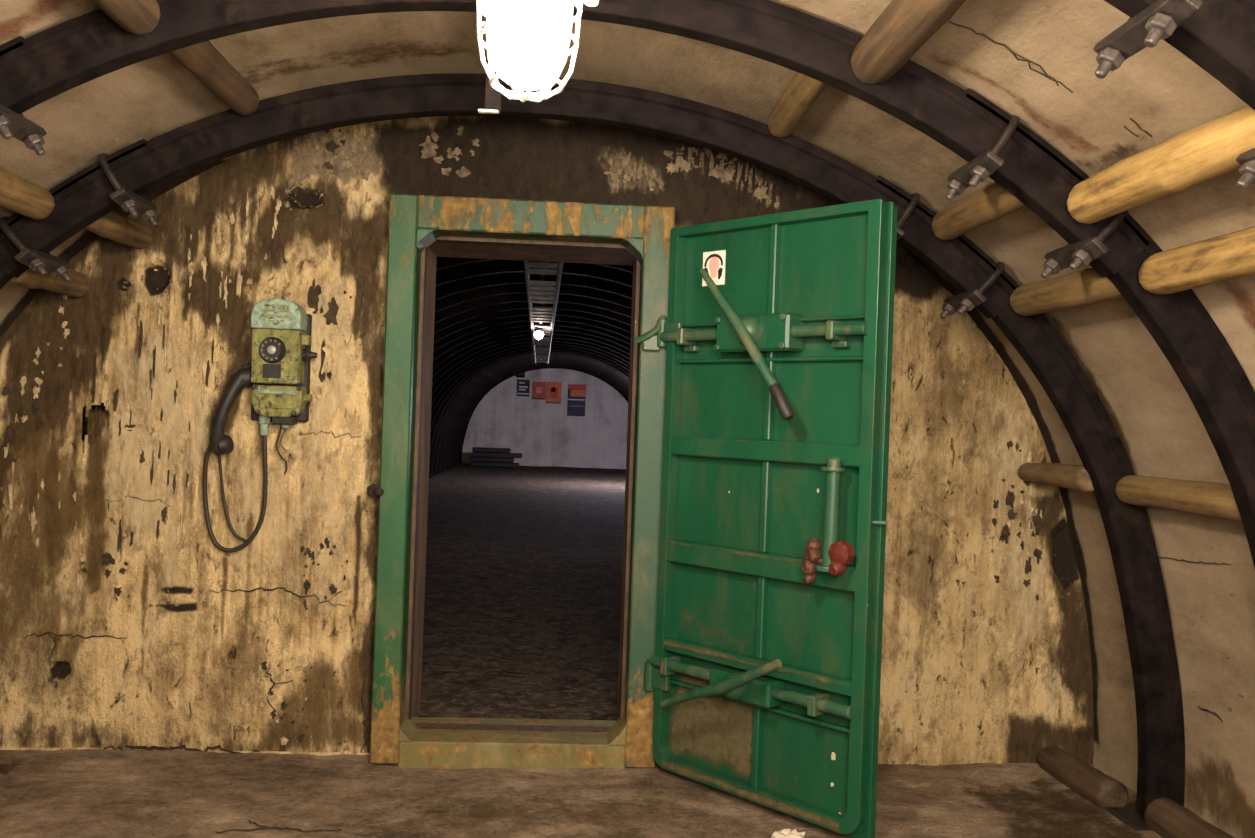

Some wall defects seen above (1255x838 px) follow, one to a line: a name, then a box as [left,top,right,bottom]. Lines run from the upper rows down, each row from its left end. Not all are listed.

crack [950,21,1073,93]
peeling [419,126,480,178]
peeling [602,144,780,209]
damp [895,241,960,302]
damp [966,307,1060,463]
damp [0,116,838,753]
crack [23,631,127,660]
crack [211,587,345,606]
damp [1007,486,1099,764]
crack [266,661,293,717]
crack [215,820,342,834]
damp [964,778,1144,838]